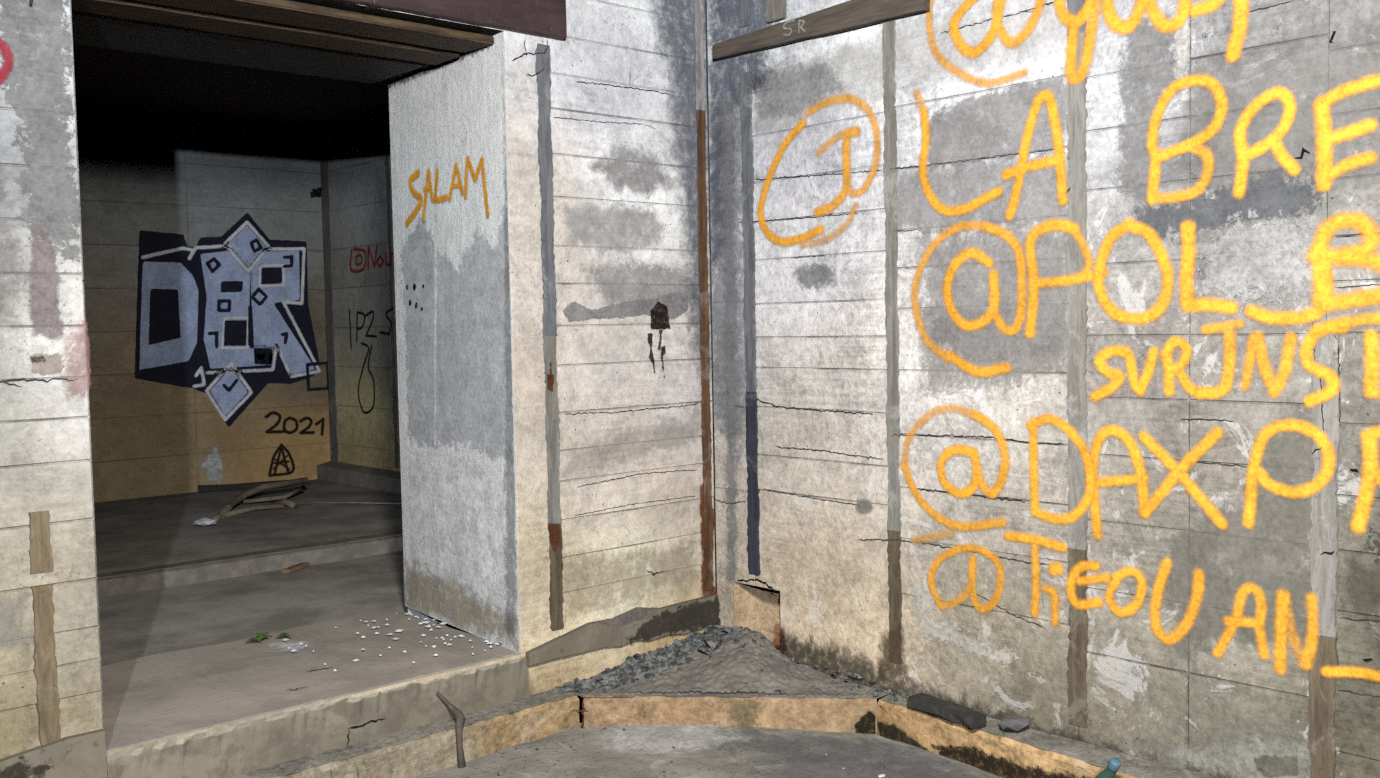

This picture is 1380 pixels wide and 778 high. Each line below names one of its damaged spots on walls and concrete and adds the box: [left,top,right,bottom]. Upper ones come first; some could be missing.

leakage [565,0,1069,580]
crack [0,378,77,386]
leakage [626,596,721,644]
leakage [0,756,50,778]